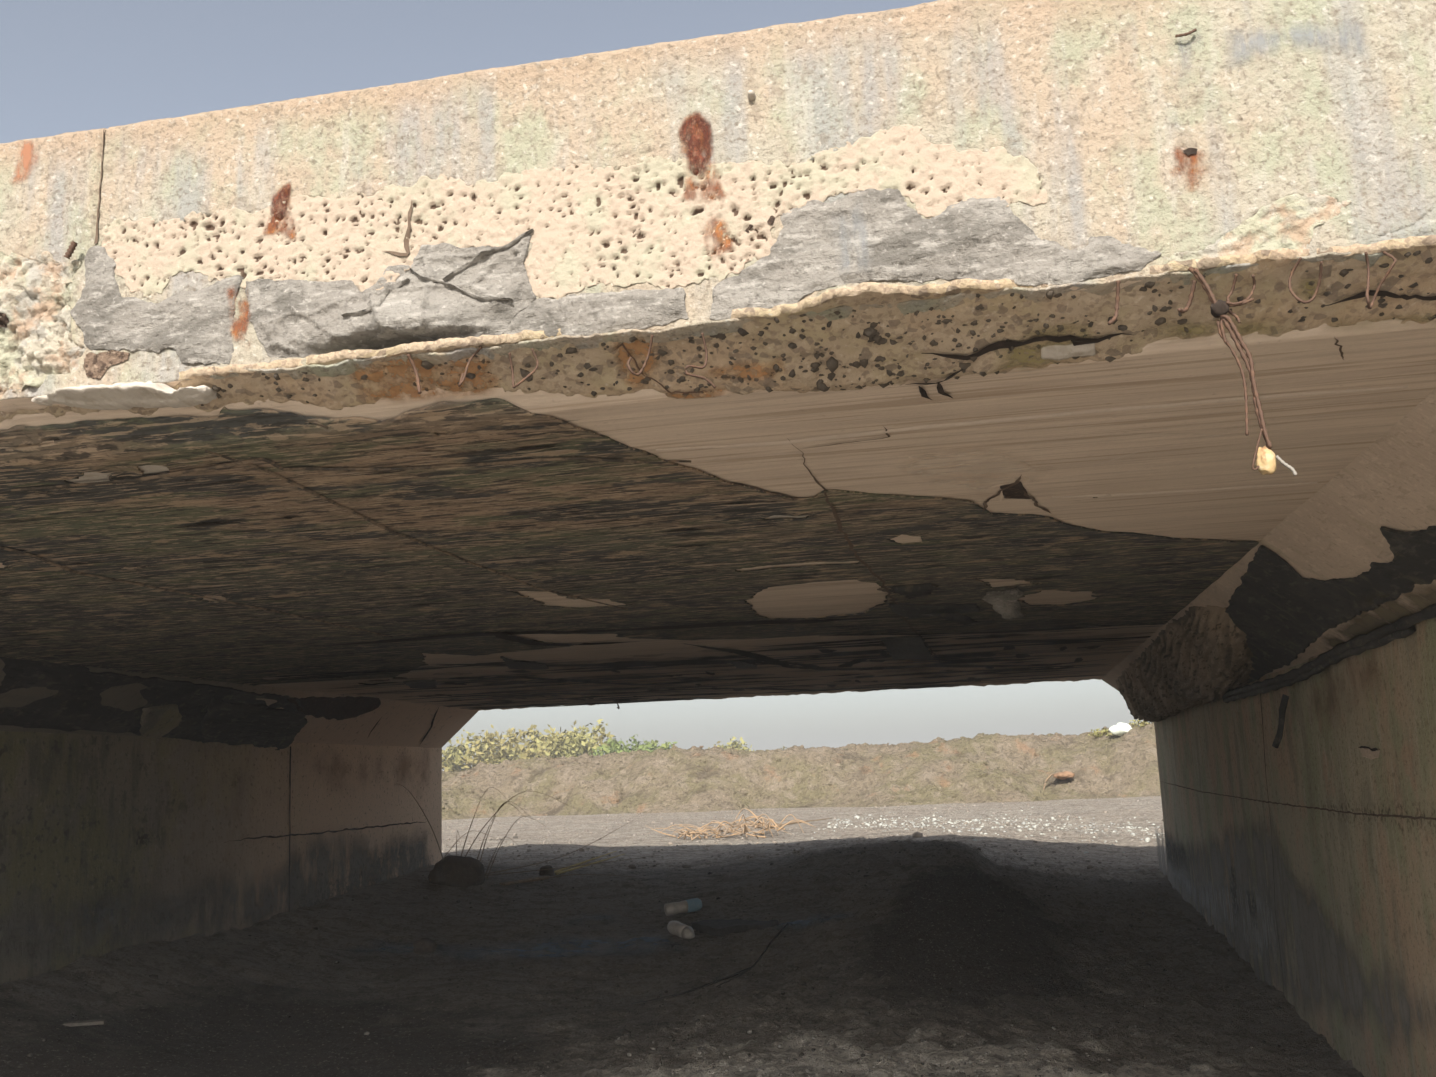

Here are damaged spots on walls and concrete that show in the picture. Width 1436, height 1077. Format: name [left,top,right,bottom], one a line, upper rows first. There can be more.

rust [680,113,724,200]
crack [94,129,105,244]
rust [265,184,295,239]
rust [708,220,732,254]
spalling [0,251,130,422]
rust [228,289,249,339]
spalling [172,193,1436,423]
rust [355,358,495,399]
spalling [982,474,1050,513]
peeling [518,591,623,607]
peeling [746,580,888,618]
peeling [981,579,1097,605]